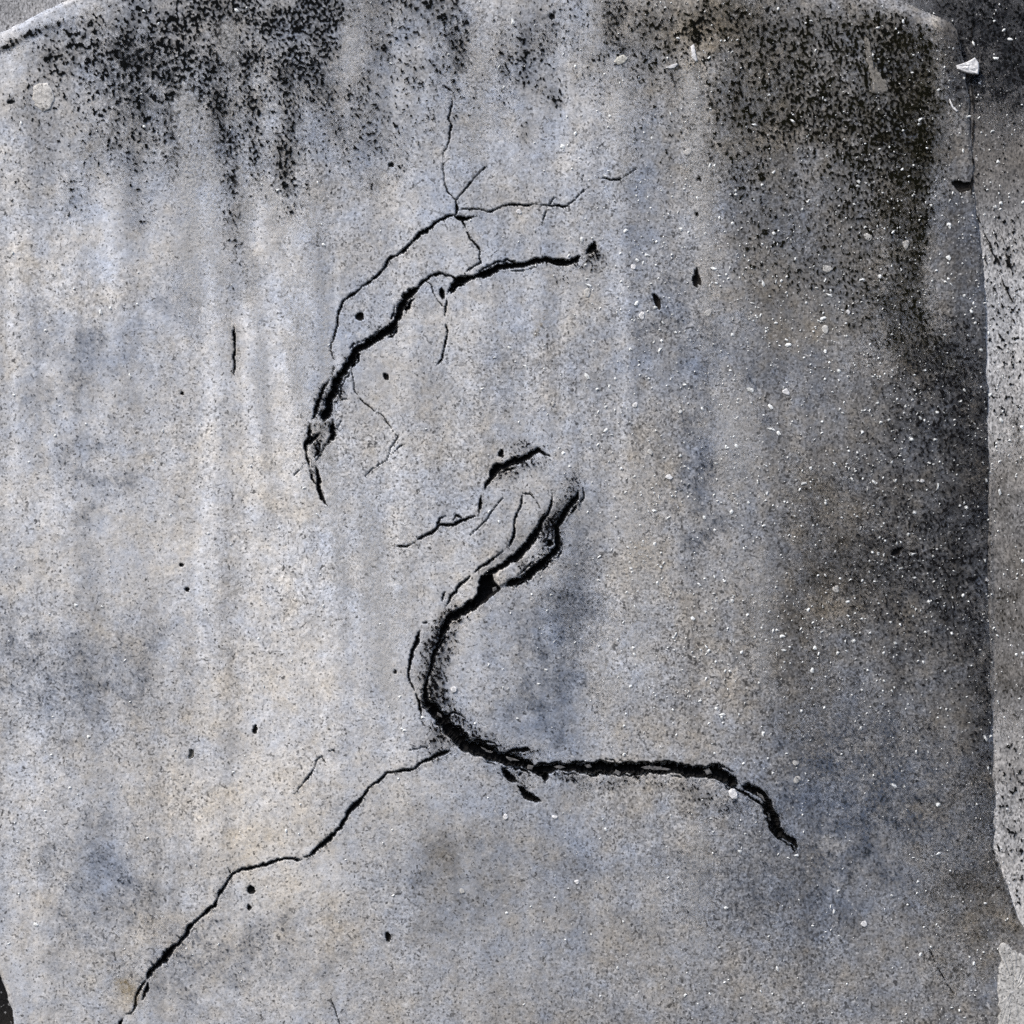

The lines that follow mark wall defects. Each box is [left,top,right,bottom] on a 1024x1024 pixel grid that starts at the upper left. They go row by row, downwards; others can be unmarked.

water stain [90,23,350,293]
crack [294,85,631,504]
water stain [445,31,514,104]
water stain [683,63,710,260]
water stain [674,323,724,552]
water stain [728,24,1019,947]
crack [119,448,797,1024]